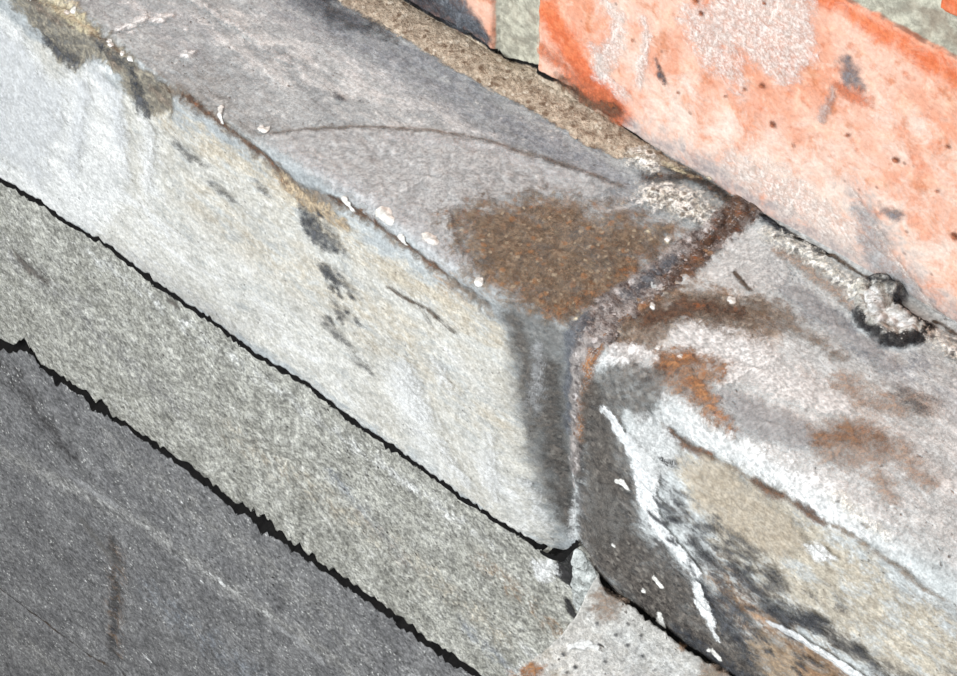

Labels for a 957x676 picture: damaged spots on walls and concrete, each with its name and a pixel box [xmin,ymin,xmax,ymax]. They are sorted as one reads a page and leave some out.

corrosion [435,186,675,329]
corrosion [574,333,607,442]
corrosion [652,346,739,438]
leakage [501,309,875,676]